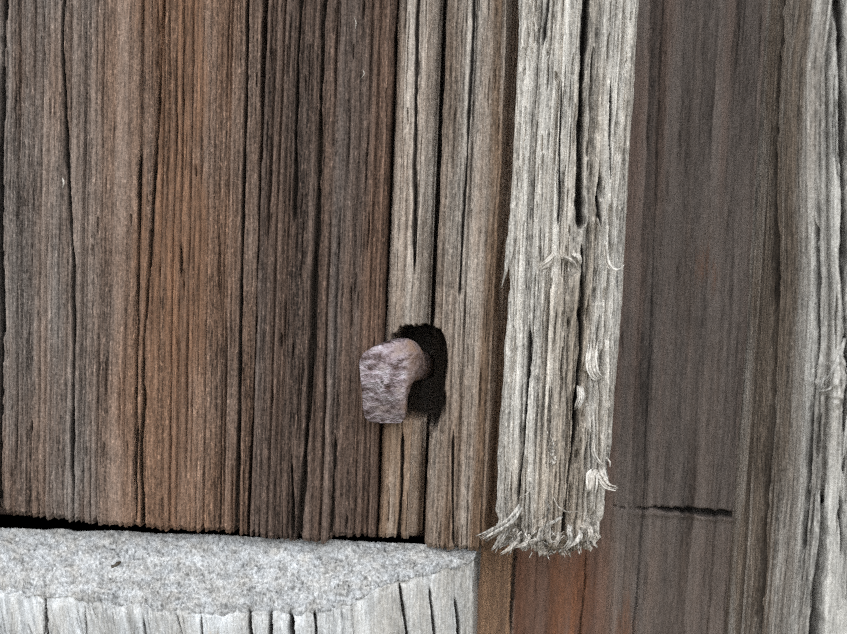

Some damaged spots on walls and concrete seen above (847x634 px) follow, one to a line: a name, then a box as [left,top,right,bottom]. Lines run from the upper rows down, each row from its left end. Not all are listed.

crack [643,498,732,516]